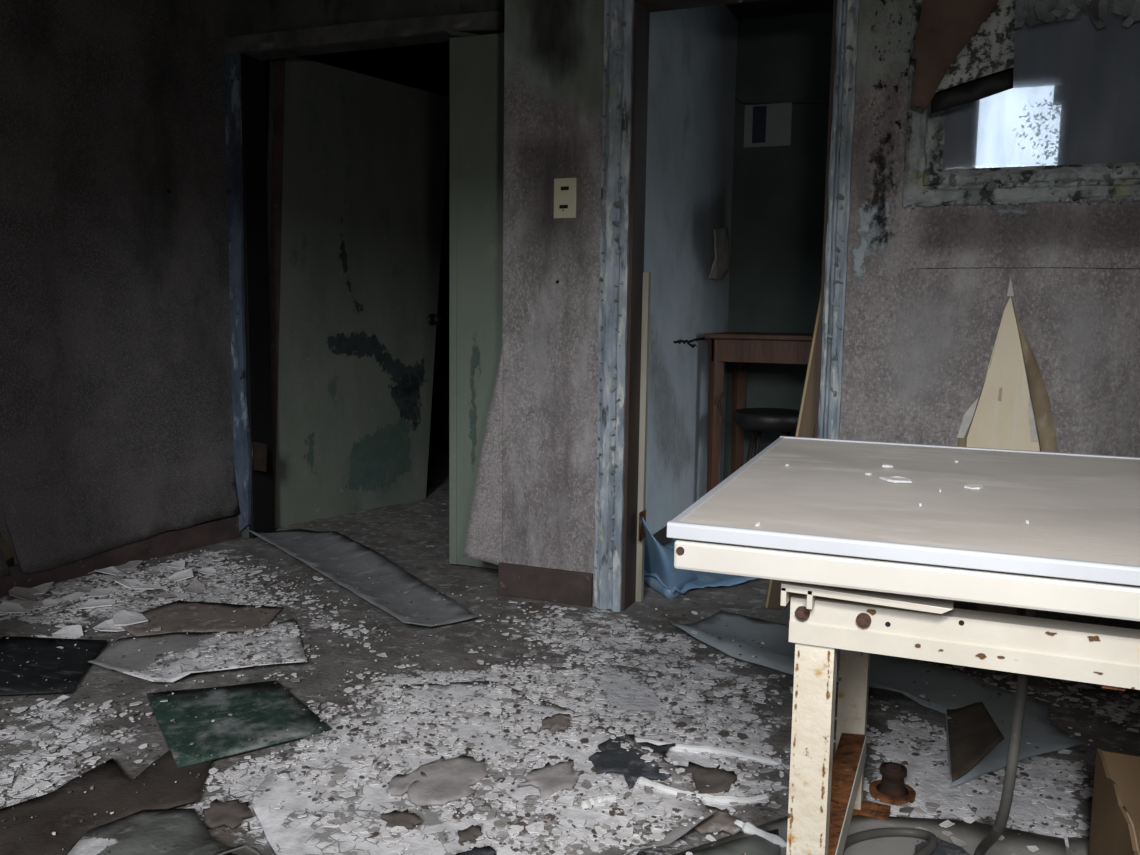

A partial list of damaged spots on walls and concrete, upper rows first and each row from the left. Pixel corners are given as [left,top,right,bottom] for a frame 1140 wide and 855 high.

peeling [1015,0,1140,29]
water stain [853,68,909,291]
peeling [929,110,1138,191]
peeling [326,329,428,430]
peeling [594,348,621,569]